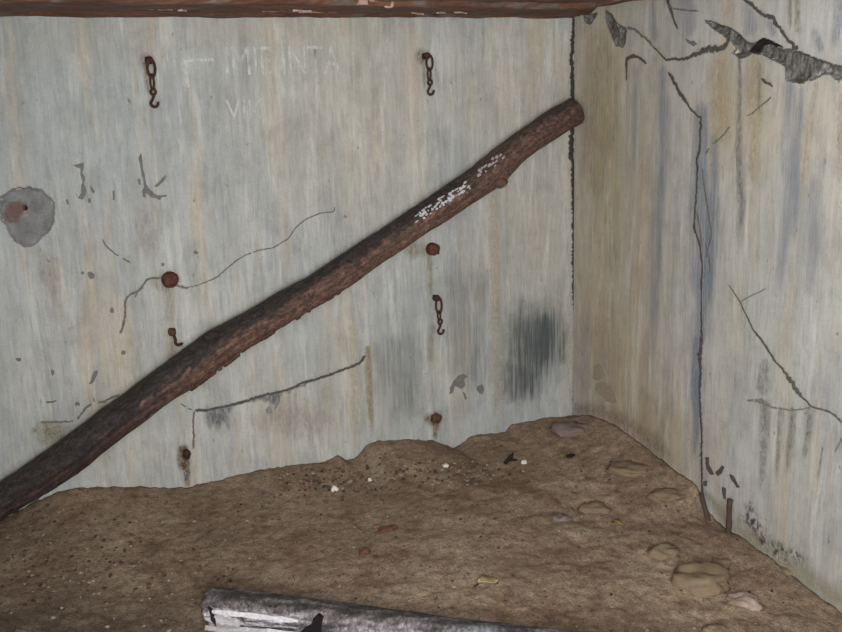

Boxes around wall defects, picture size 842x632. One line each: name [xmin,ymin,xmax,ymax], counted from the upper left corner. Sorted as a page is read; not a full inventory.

spalling [583,10,626,48]
crack [666,0,698,29]
crack [743,0,798,52]
spalling [705,20,842,84]
crack [747,78,773,116]
spalling [74,163,95,203]
spalling [0,186,56,248]
crack [119,207,335,334]
crack [625,26,752,494]
crack [729,286,842,452]
crack [180,355,366,449]